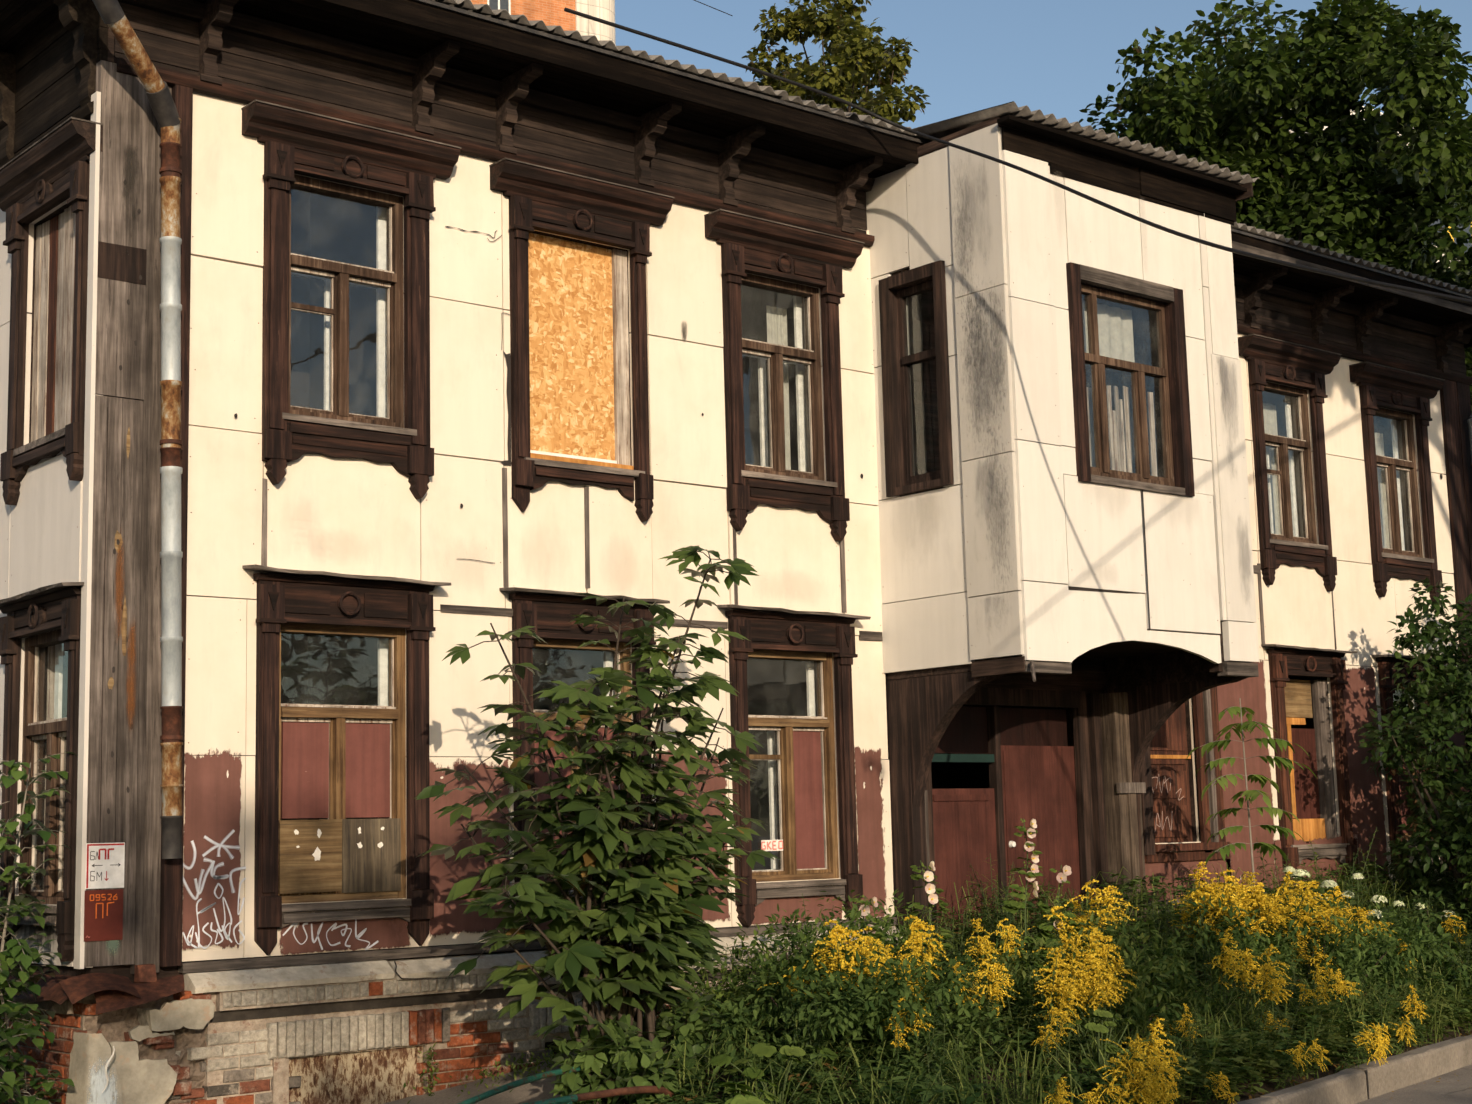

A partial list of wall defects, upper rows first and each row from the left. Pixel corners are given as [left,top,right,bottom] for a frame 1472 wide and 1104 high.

rust [124,148,138,220]
rust [116,547,135,719]
spalling [84,990,217,1104]